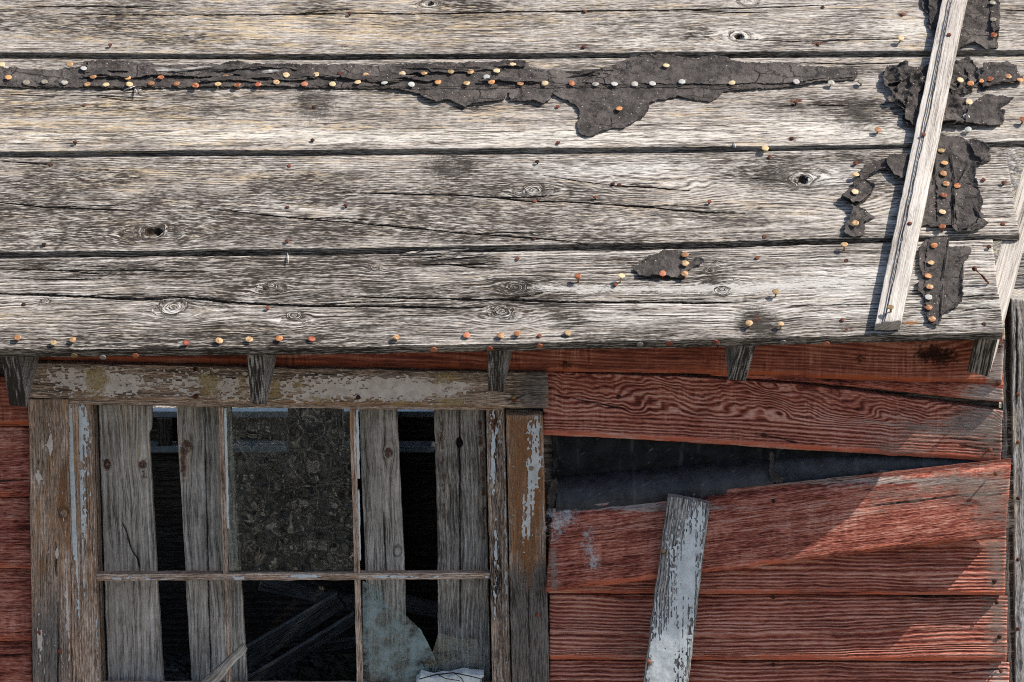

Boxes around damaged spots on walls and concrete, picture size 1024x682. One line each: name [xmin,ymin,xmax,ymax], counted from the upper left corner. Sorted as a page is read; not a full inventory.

peeling [269,370,490,405]
water stain [914,344,958,366]
peeling [37,365,251,678]
peeling [485,410,543,629]
peeling [646,500,705,682]